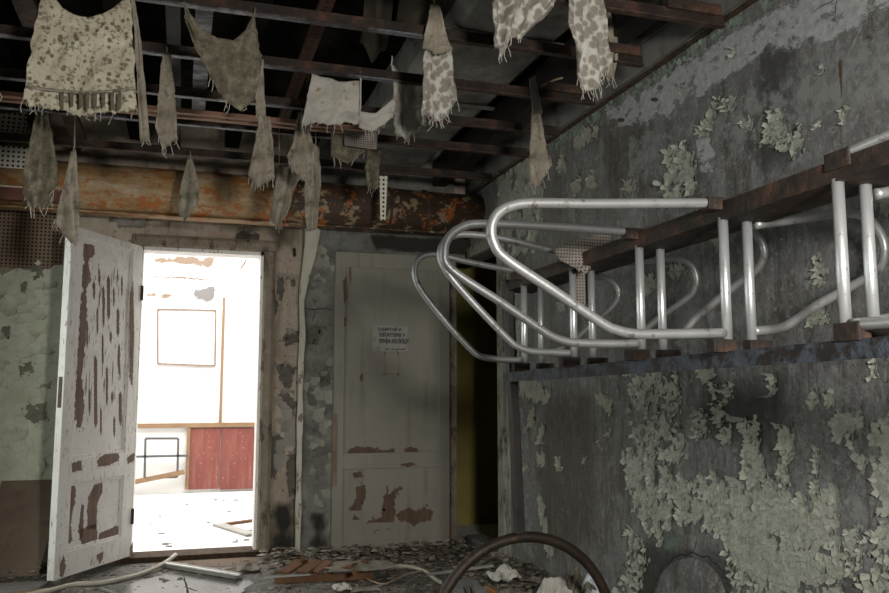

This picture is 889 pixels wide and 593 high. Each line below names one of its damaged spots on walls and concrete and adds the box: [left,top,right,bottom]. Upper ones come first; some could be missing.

peeling [548,12,749,198]
peeling [736,107,821,160]
peeling [836,105,849,125]
spalling [275,272,299,316]
peeling [310,245,334,288]
peeling [0,258,64,486]
peeling [865,358,879,382]
peeling [271,324,333,497]
peeling [519,380,563,472]
peeling [594,369,889,593]
peeling [536,491,554,559]